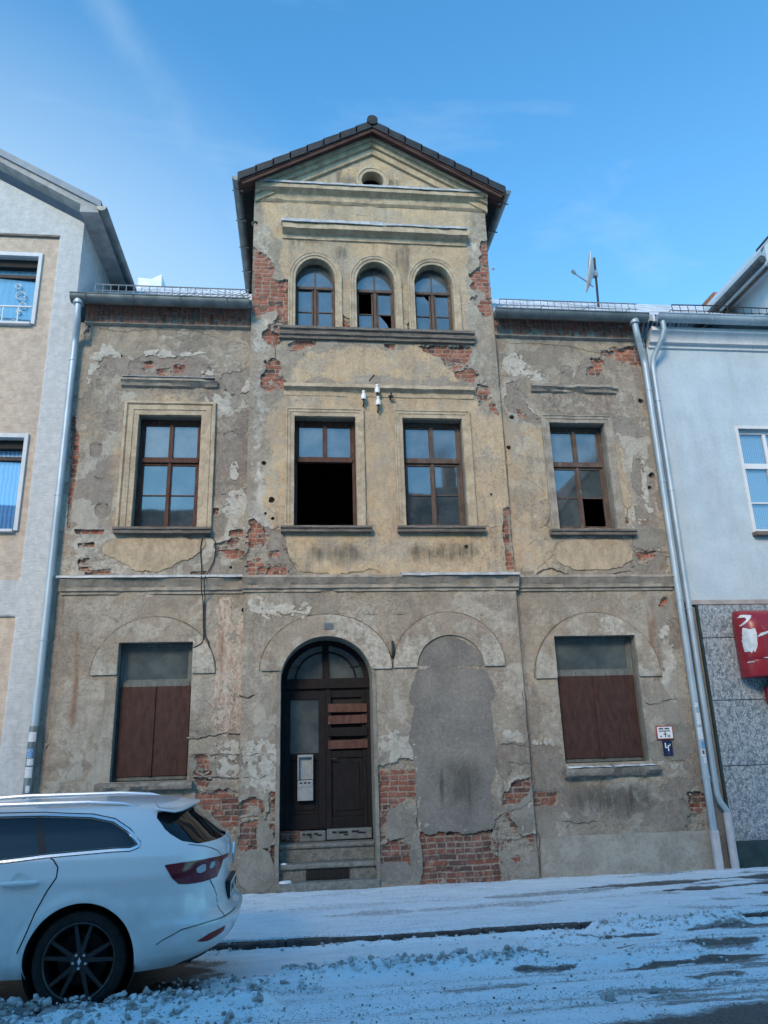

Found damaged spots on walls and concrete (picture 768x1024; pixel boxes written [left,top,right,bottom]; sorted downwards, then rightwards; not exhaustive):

flaking render [84,247,316,414]
flaking render [419,345,545,425]
flaking render [586,345,646,377]
flaking render [67,414,112,575]
flaking render [213,431,296,575]
flaking render [502,505,514,570]
crack [535,567,569,575]
peeling [187,596,313,864]
flaking render [374,729,568,885]
flaking render [658,777,710,831]